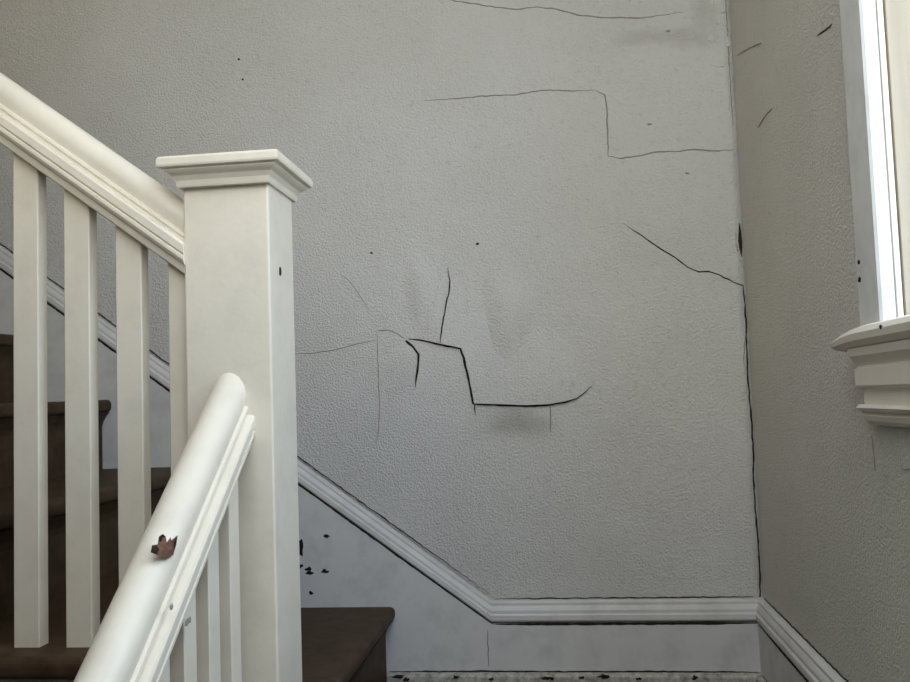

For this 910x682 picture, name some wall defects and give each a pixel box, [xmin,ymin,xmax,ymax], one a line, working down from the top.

crack [452,0,681,19]
crack [725,0,762,121]
crack [423,89,723,159]
crack [0,243,13,279]
crack [47,277,64,316]
crack [98,313,117,354]
crack [149,350,170,392]
crack [297,225,849,682]